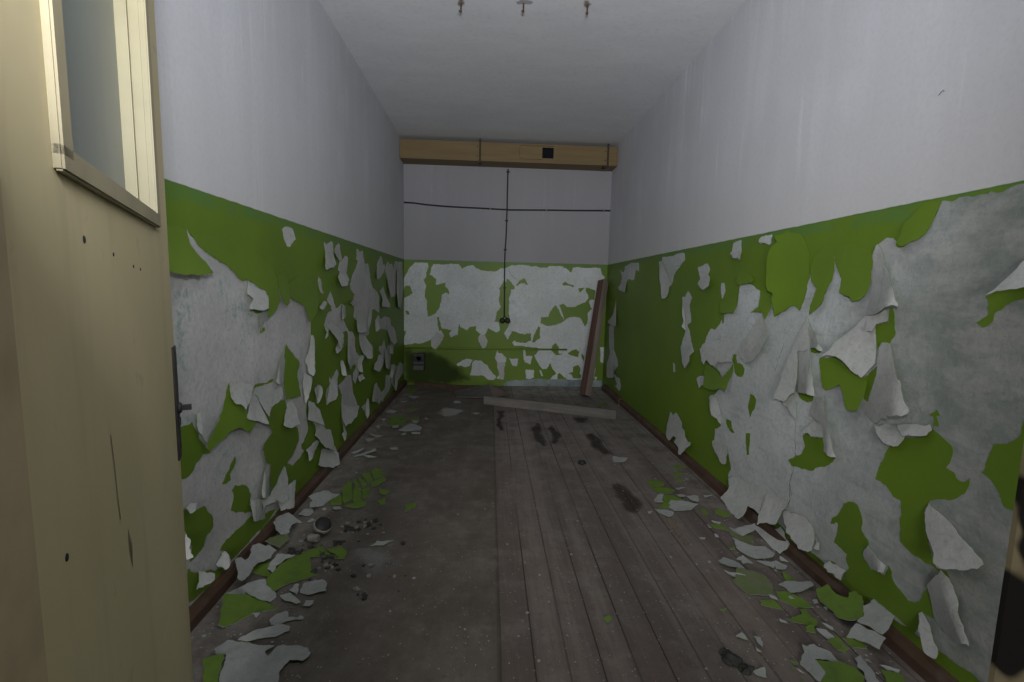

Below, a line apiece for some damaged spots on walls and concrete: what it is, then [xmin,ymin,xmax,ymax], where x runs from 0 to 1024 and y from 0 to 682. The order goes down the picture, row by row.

peeling [618,262,639,292]
peeling [659,253,685,299]
peeling [167,225,621,606]
peeling [666,412,691,455]
peeling [673,184,1024,682]